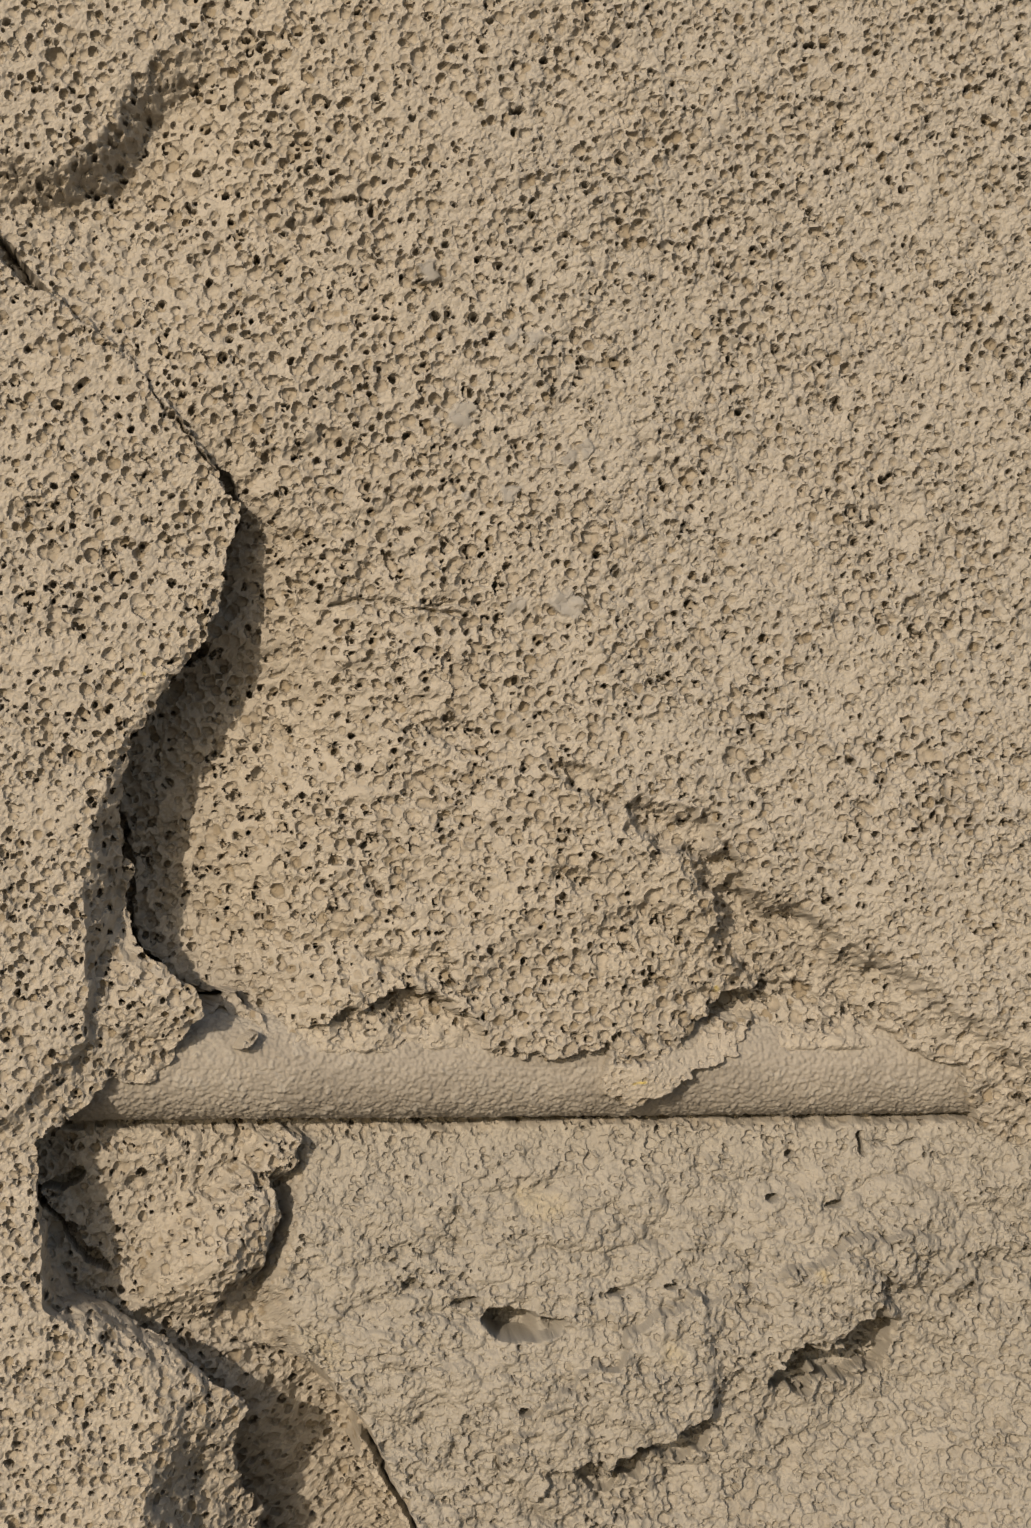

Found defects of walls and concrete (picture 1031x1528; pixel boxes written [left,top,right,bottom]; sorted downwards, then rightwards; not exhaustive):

crack [0,232,243,557]
crack [130,622,211,740]
crack [119,809,227,998]
spalling [33,373,1031,1528]